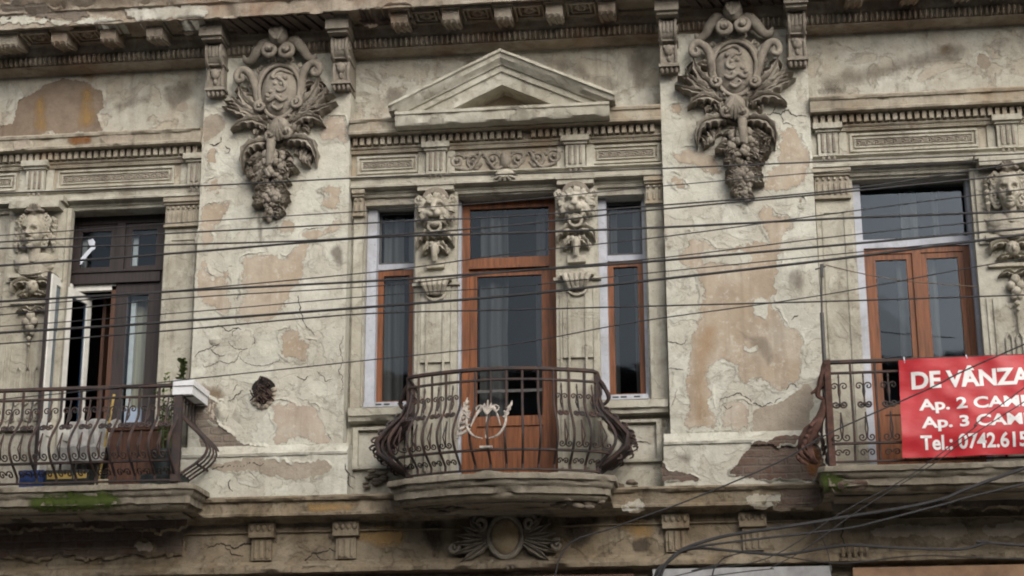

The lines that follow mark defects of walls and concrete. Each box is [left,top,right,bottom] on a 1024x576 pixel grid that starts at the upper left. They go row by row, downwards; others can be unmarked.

spalling [0,76,135,156]
peeling [194,146,349,366]
crack [195,325,255,401]
peeling [661,122,1024,540]
spalling [193,376,335,483]